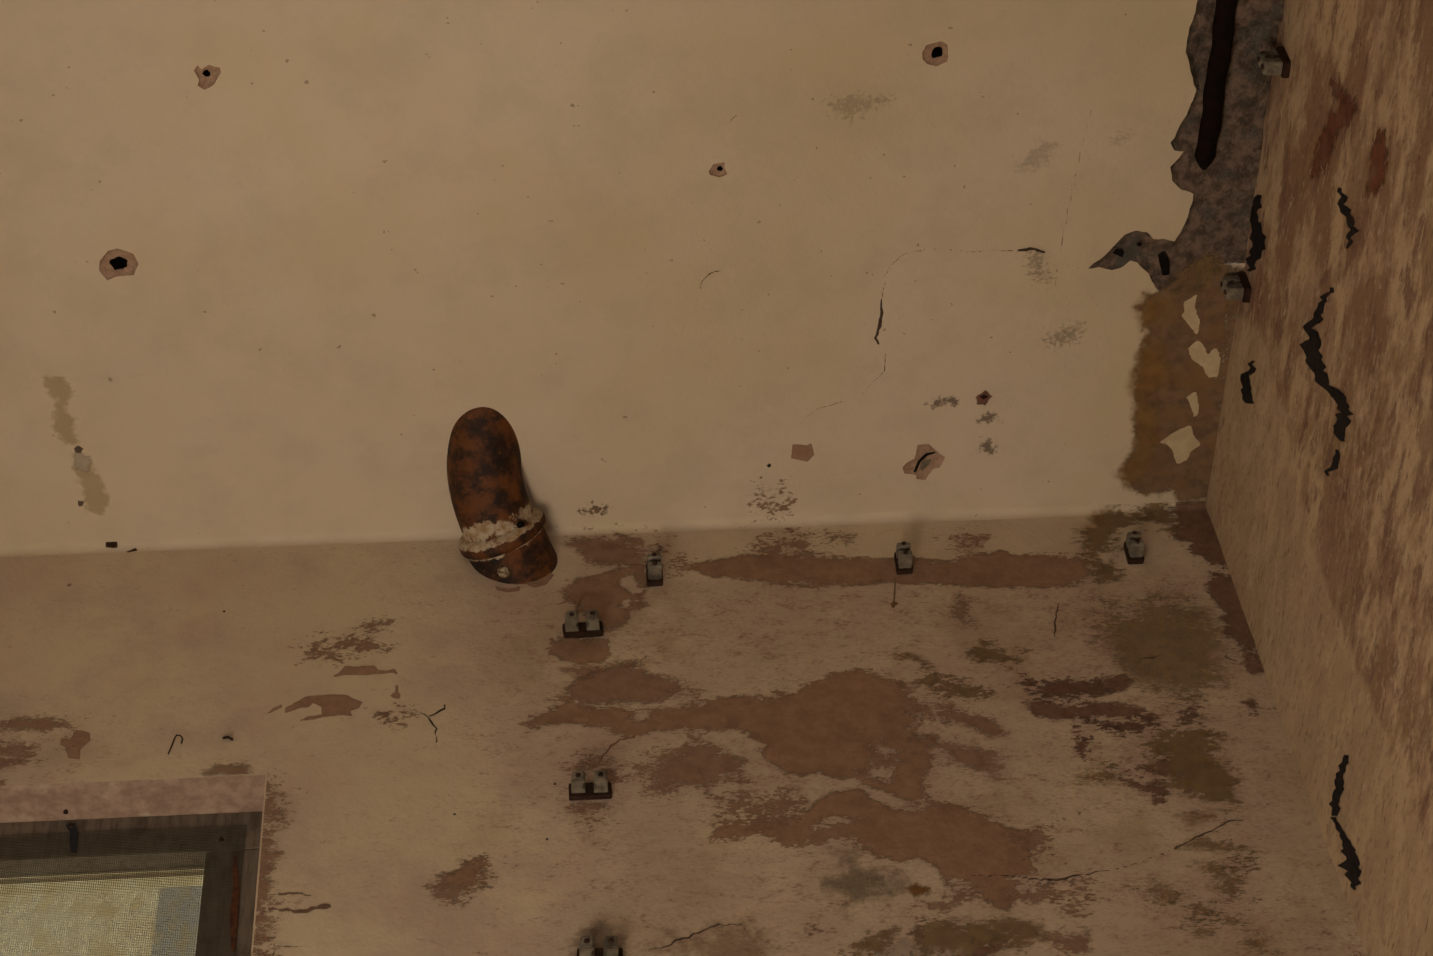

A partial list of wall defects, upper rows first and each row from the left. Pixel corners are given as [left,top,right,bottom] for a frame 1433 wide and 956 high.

flaking render [1088,0,1285,290]
crack [868,247,1046,387]
damp [74,446,91,472]
damp [1059,252,1285,955]
peeling [1168,501,1265,674]
peeling [0,717,90,786]
peeling [268,619,420,730]
peeling [496,476,1118,956]
peeling [1014,672,1205,763]
peeling [1117,758,1174,805]
peeling [422,852,509,907]